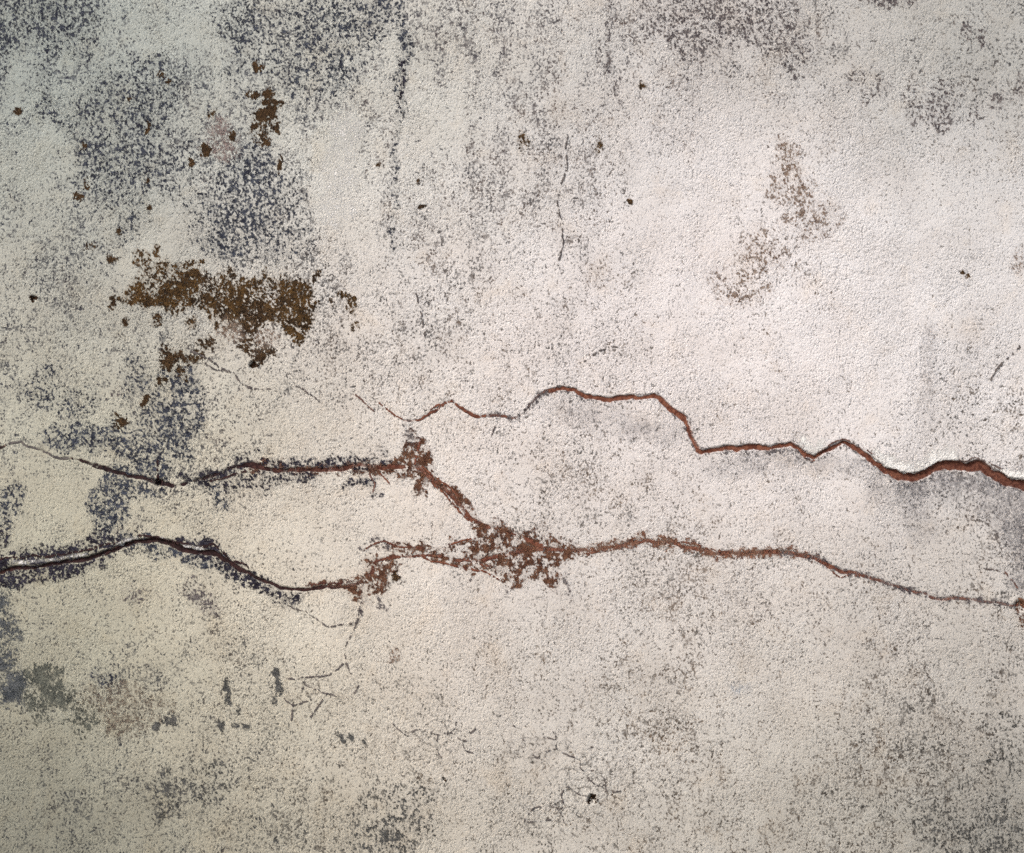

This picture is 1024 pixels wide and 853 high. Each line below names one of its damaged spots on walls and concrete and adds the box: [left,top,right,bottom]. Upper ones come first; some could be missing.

damp [0,0,316,265]
rust [187,142,212,168]
rust [245,87,284,148]
damp [205,0,414,254]
rust [107,244,360,408]
rust [113,412,130,431]
crack [0,345,1024,721]